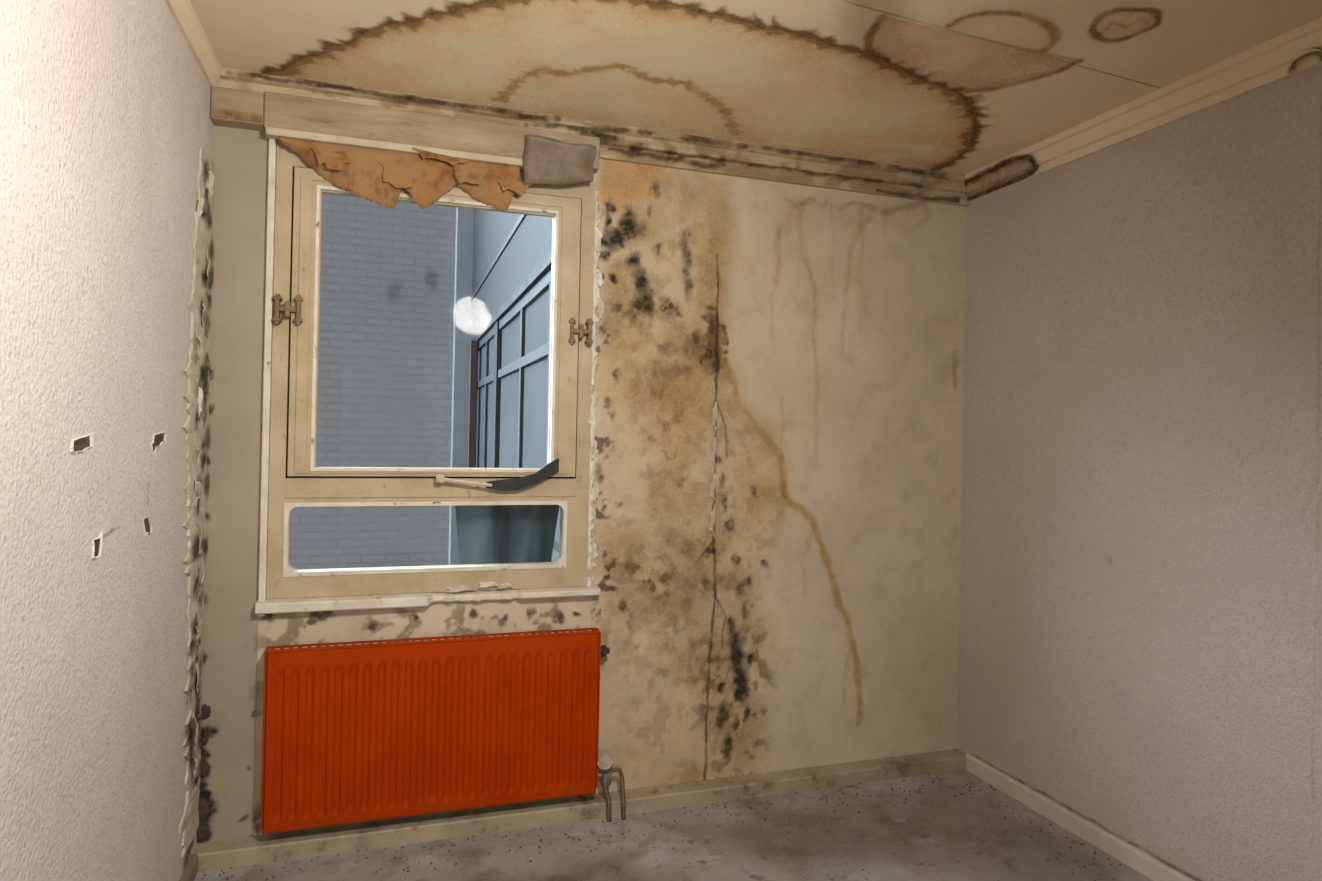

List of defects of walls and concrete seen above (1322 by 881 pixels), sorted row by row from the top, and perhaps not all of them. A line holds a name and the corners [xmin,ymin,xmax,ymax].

damp [251,0,531,90]
damp [1090,19,1131,42]
damp [1119,9,1160,30]
damp [372,91,475,109]
damp [598,0,1082,187]
damp [493,65,747,405]
damp [595,437,609,478]
damp [599,549,629,591]
damp [697,578,753,750]
damp [185,704,217,862]